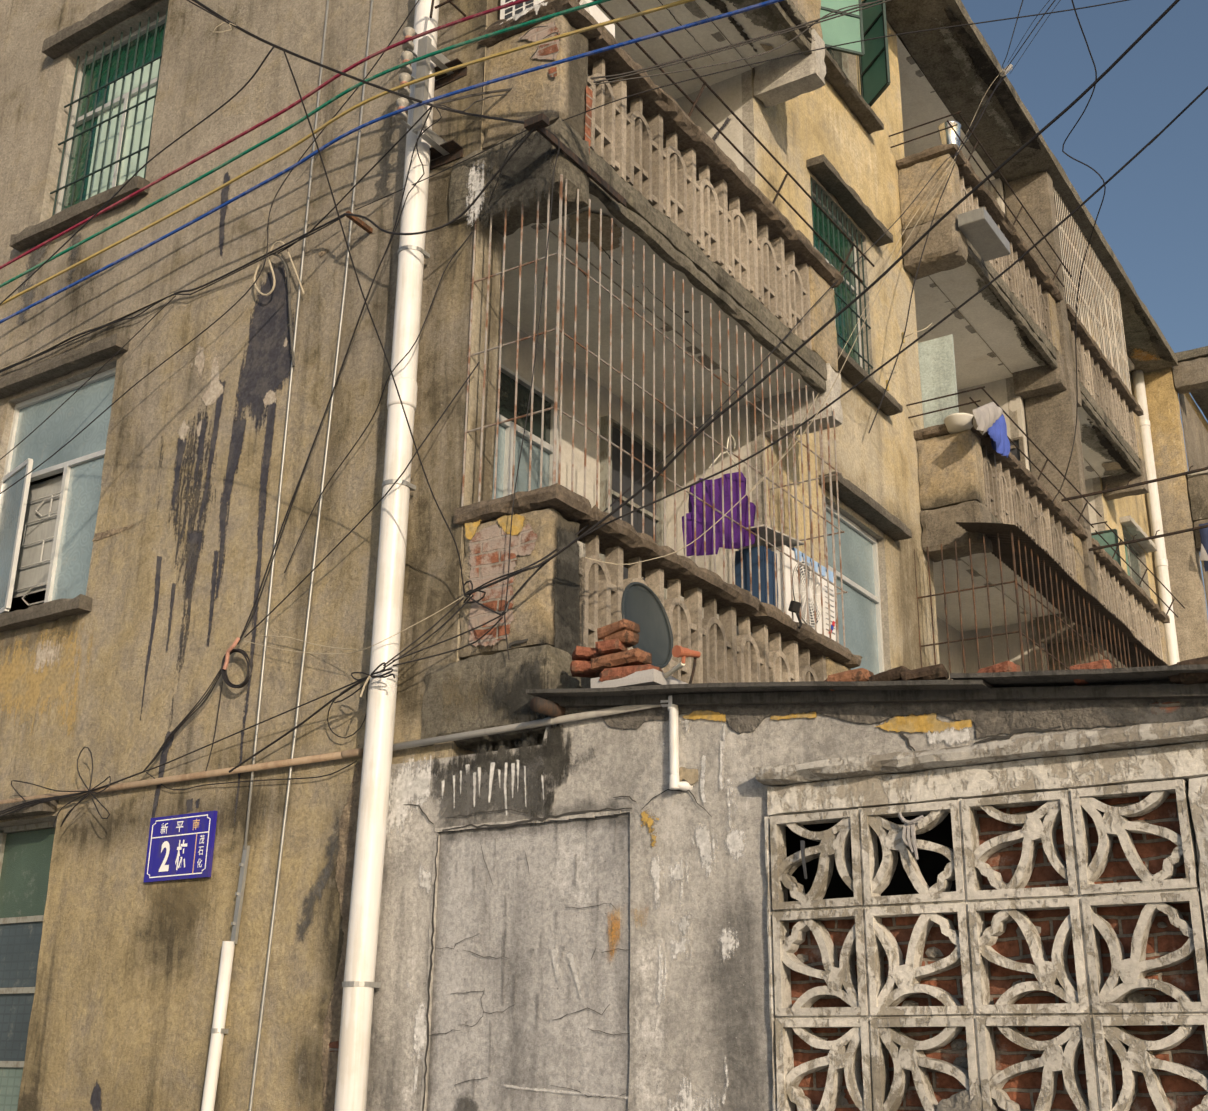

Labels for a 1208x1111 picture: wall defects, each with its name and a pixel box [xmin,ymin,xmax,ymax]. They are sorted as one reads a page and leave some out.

peeling [705,0,774,52]
peeling [778,0,815,41]
spalling [464,514,538,647]
leakage [386,526,595,836]
peeling [565,698,1208,745]
crack [403,789,712,1111]
leakage [454,1097,478,1111]